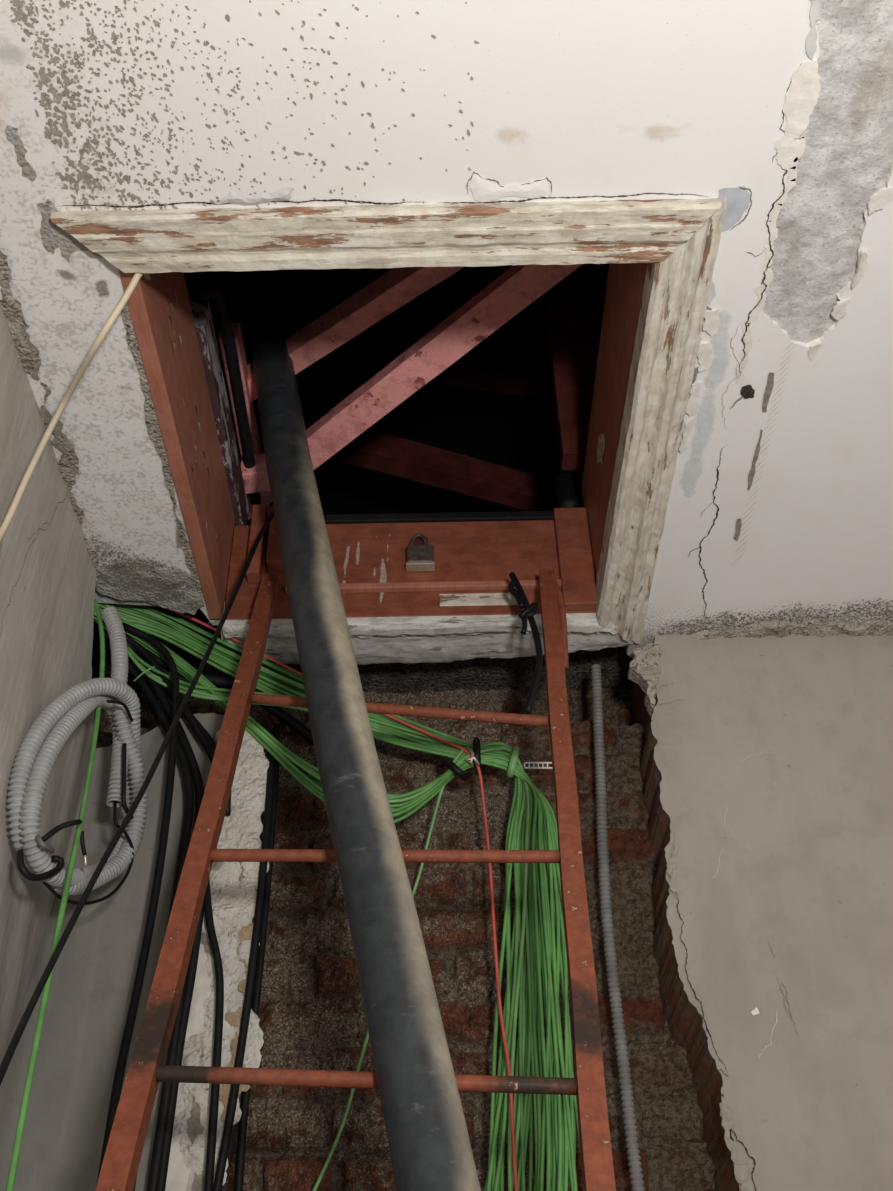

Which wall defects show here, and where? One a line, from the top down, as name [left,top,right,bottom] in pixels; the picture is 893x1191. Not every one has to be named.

flaking render [5,125,37,181]
peeling [10,0,405,263]
peeling [441,168,752,231]
flaking render [761,0,893,360]
crack [688,63,806,615]
peeling [679,282,729,496]
spalling [730,372,774,412]
spalling [747,429,763,491]
spalling [734,518,742,541]
flaking render [628,642,663,716]
flaking render [666,831,679,899]
flaking render [719,1087,753,1191]